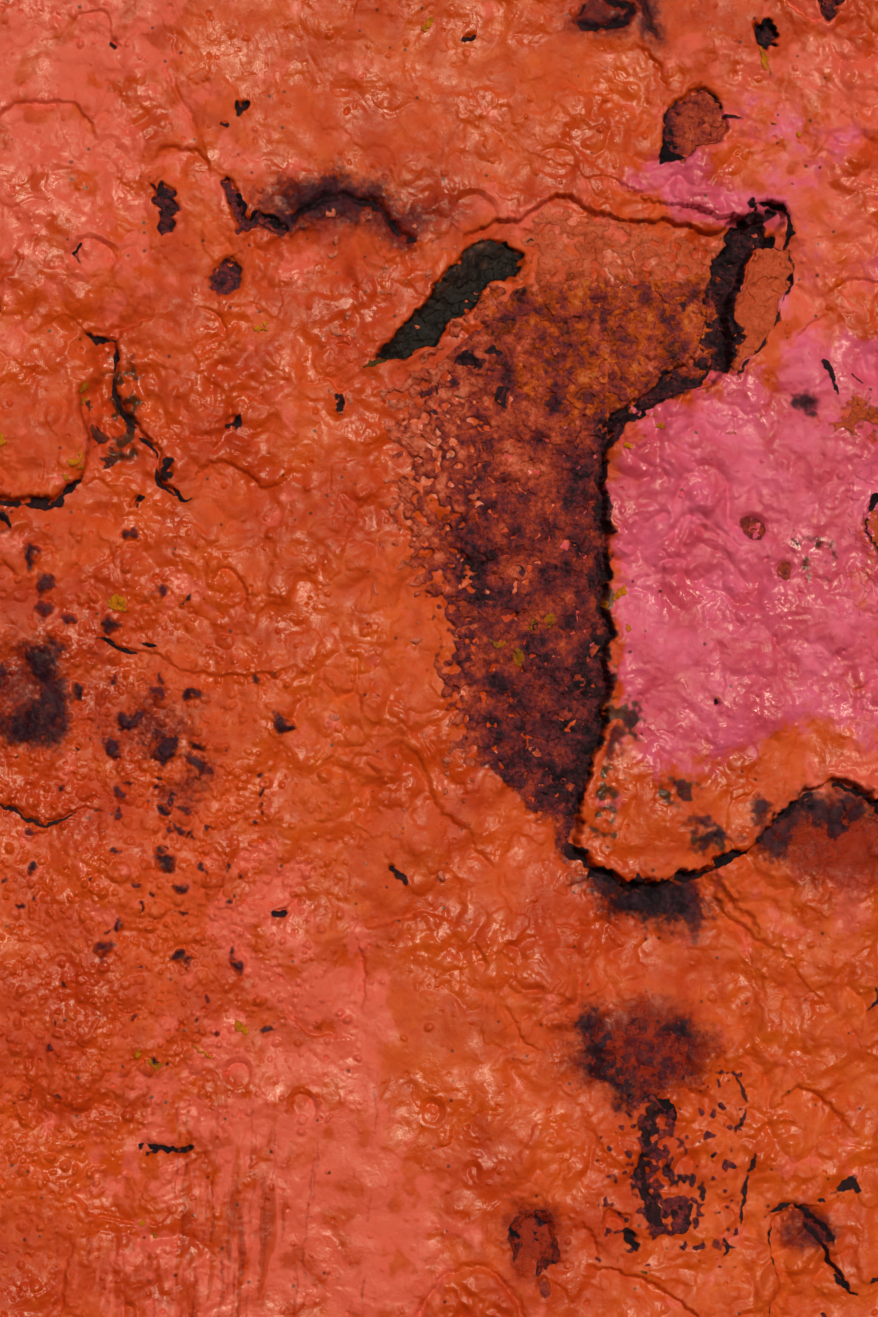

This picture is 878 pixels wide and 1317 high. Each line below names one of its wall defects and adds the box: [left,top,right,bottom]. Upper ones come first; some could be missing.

crack [570,0,664,43]
crack [259,168,427,249]
spalling [450,186,505,240]
crack [85,333,193,502]
crack [0,476,83,528]
corrosion [0,639,71,746]
crack [564,782,878,920]
corrosion [559,1002,756,1268]